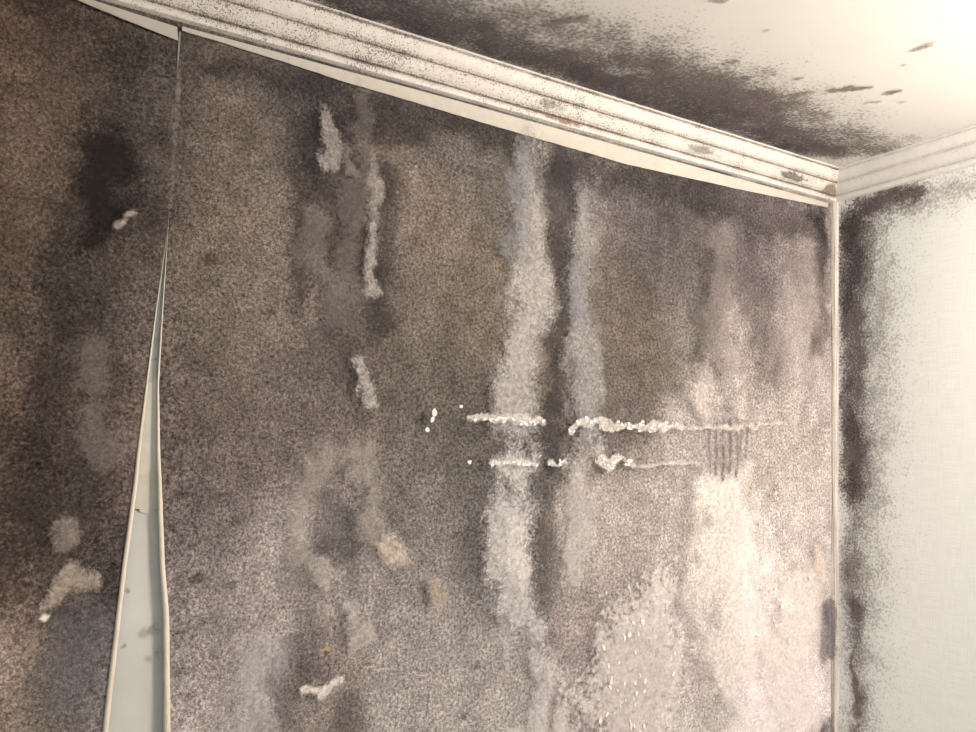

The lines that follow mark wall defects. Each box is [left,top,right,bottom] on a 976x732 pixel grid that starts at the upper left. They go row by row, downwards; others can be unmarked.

damp [73,131,141,247]
damp [319,88,928,732]
damp [40,562,101,622]
damp [300,677,343,699]